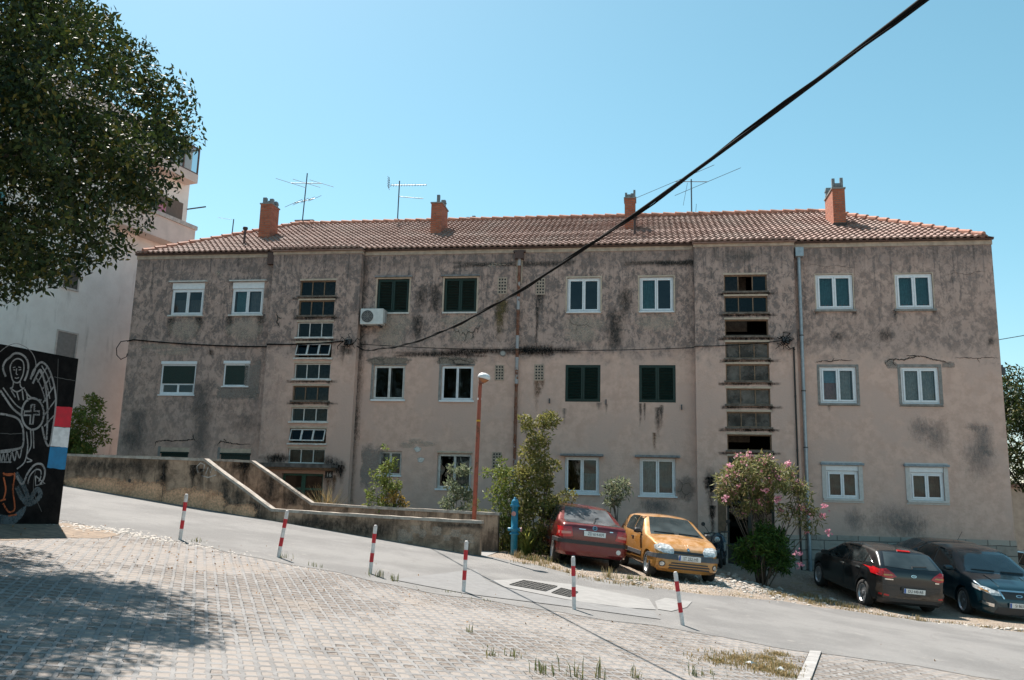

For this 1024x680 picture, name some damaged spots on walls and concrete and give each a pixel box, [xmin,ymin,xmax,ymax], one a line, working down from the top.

crack [885,355,994,366]
crack [155,436,244,502]
leakage [222,478,302,518]